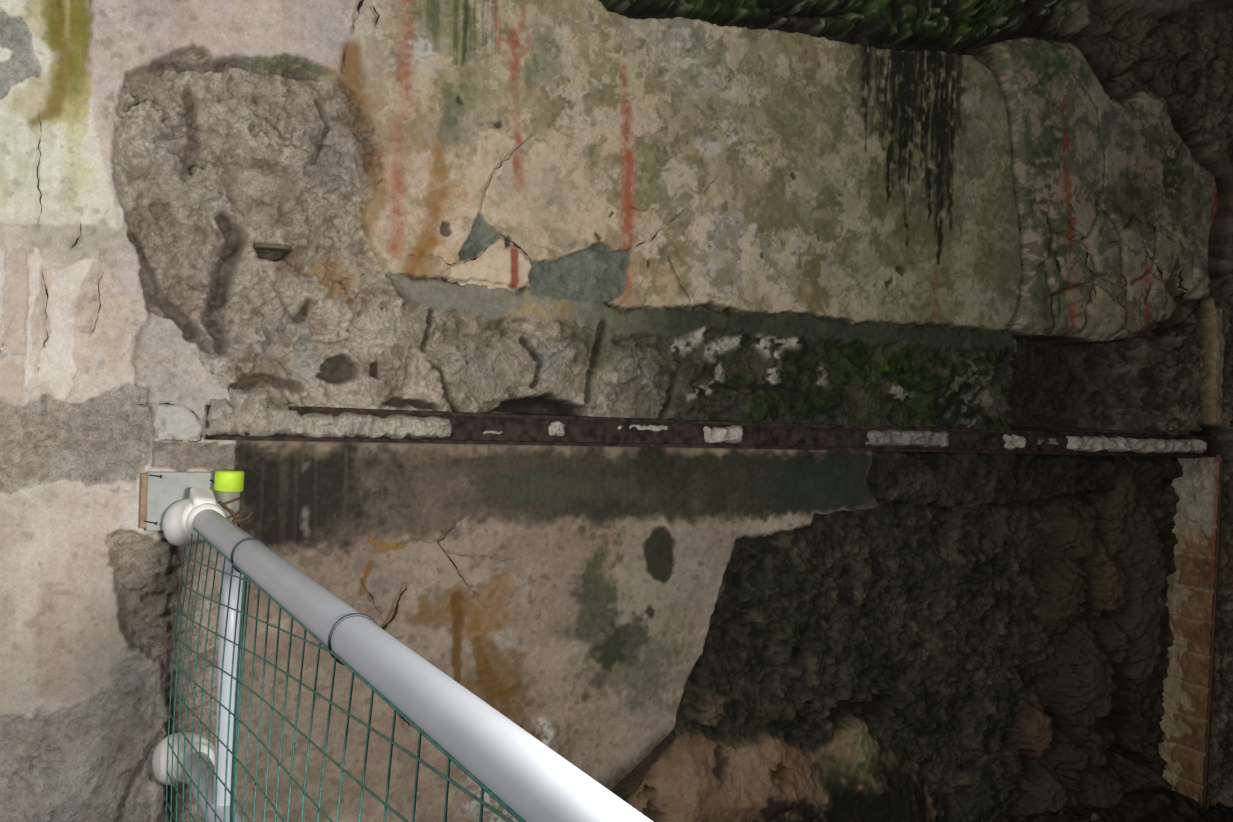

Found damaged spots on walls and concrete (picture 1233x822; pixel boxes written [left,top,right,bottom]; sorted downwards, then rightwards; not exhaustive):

water stain [32,0,91,124]
water stain [862,46,963,264]
crack [408,235,549,266]
flaking render [0,47,1017,497]
crack [1046,223,1188,330]
flaking render [105,529,221,747]
corrosion [360,538,405,594]
crack [364,586,407,630]
corrosion [446,592,539,737]
water stain [644,527,674,583]
flaking render [163,784,204,822]
water stain [462,777,519,822]